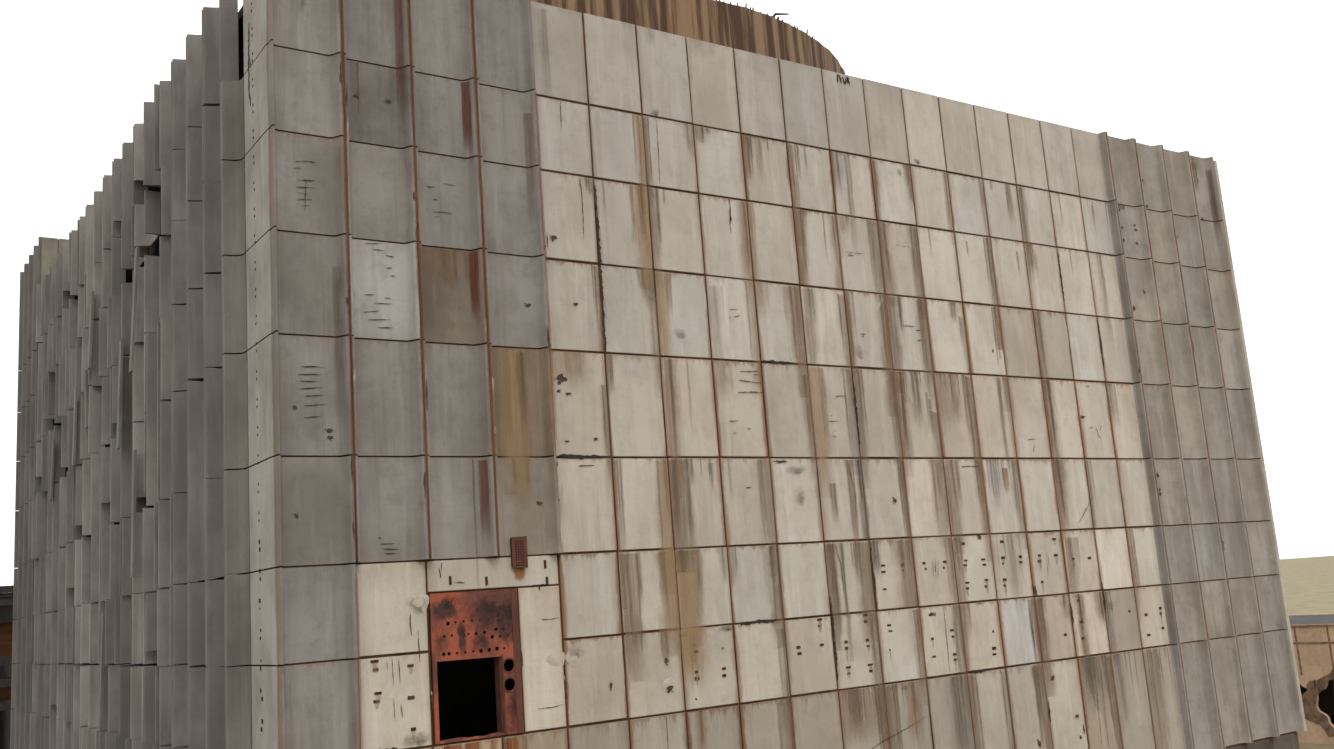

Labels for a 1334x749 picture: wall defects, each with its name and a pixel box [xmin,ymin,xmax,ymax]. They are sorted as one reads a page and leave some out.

rust [461,0,500,553]
spalling [1301,667,1334,737]